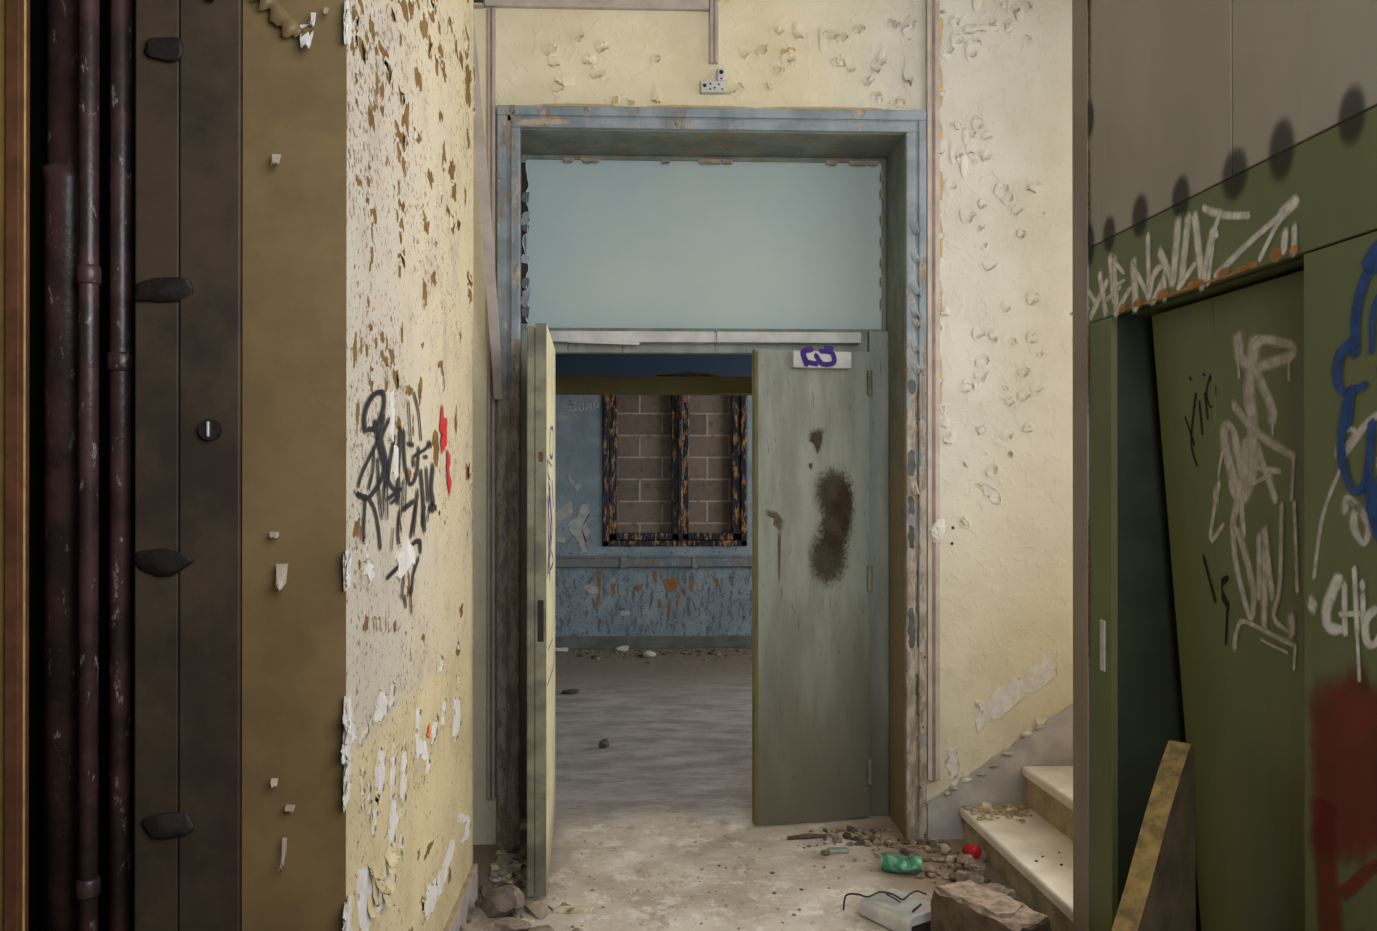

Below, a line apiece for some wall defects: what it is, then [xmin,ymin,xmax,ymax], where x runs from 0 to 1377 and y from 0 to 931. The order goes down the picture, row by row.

peeling [541,26,664,107]
peeling [740,0,918,110]
peeling [940,0,1035,62]
peeling [940,114,994,267]
peeling [251,0,476,487]
peeling [940,326,1049,444]
peeling [276,564,288,592]
flaking render [343,514,376,592]
flaking render [392,531,416,636]
flaking render [973,647,1059,734]
flaking render [340,600,472,931]
peeling [279,838,287,873]